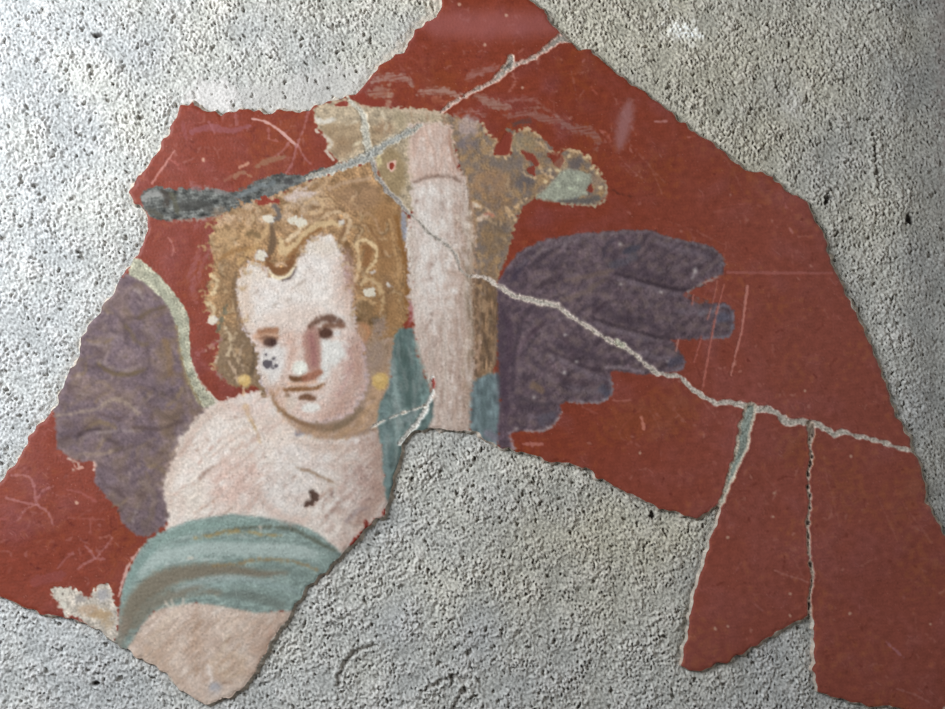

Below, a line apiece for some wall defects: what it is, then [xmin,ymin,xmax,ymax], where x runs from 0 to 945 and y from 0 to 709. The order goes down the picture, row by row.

peeling [51,583,119,642]
crack [306,34,912,618]